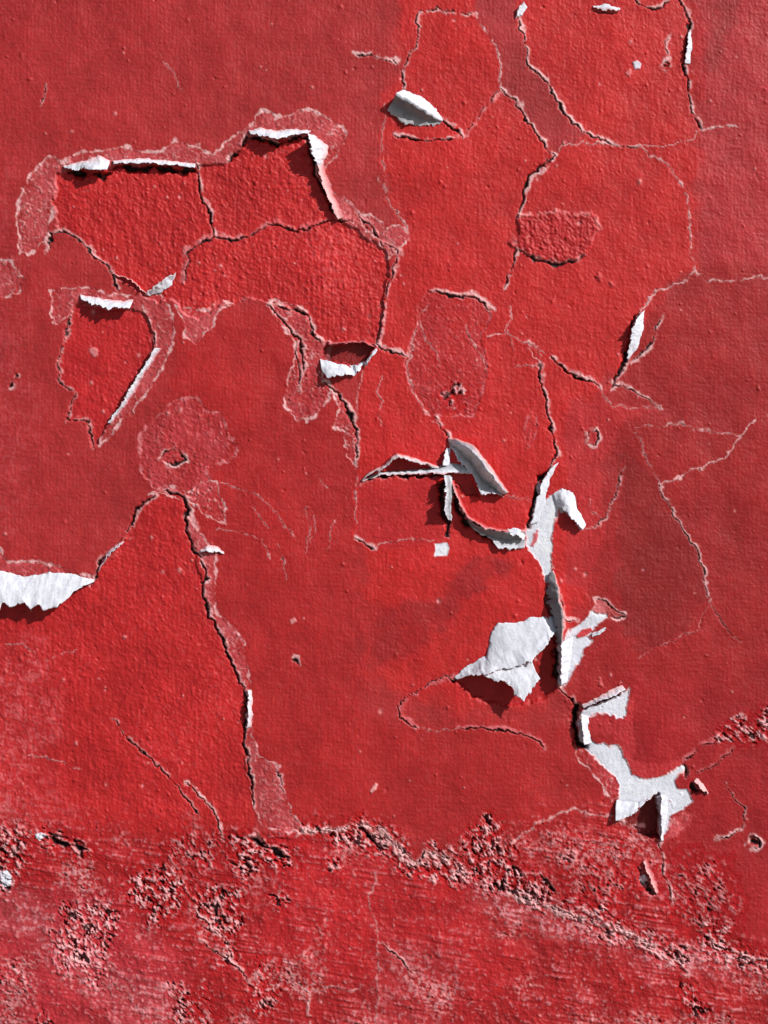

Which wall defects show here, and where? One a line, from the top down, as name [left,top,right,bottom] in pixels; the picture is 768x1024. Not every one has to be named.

peeling [387,90,466,145]
peeling [0,106,395,466]
crack [351,0,768,553]
crack [484,246,768,661]
crack [2,641,80,665]
flaking render [0,288,768,1024]
crack [26,752,84,774]
crack [109,718,223,827]
crack [413,724,548,755]
crack [509,805,615,847]
crack [682,738,750,844]